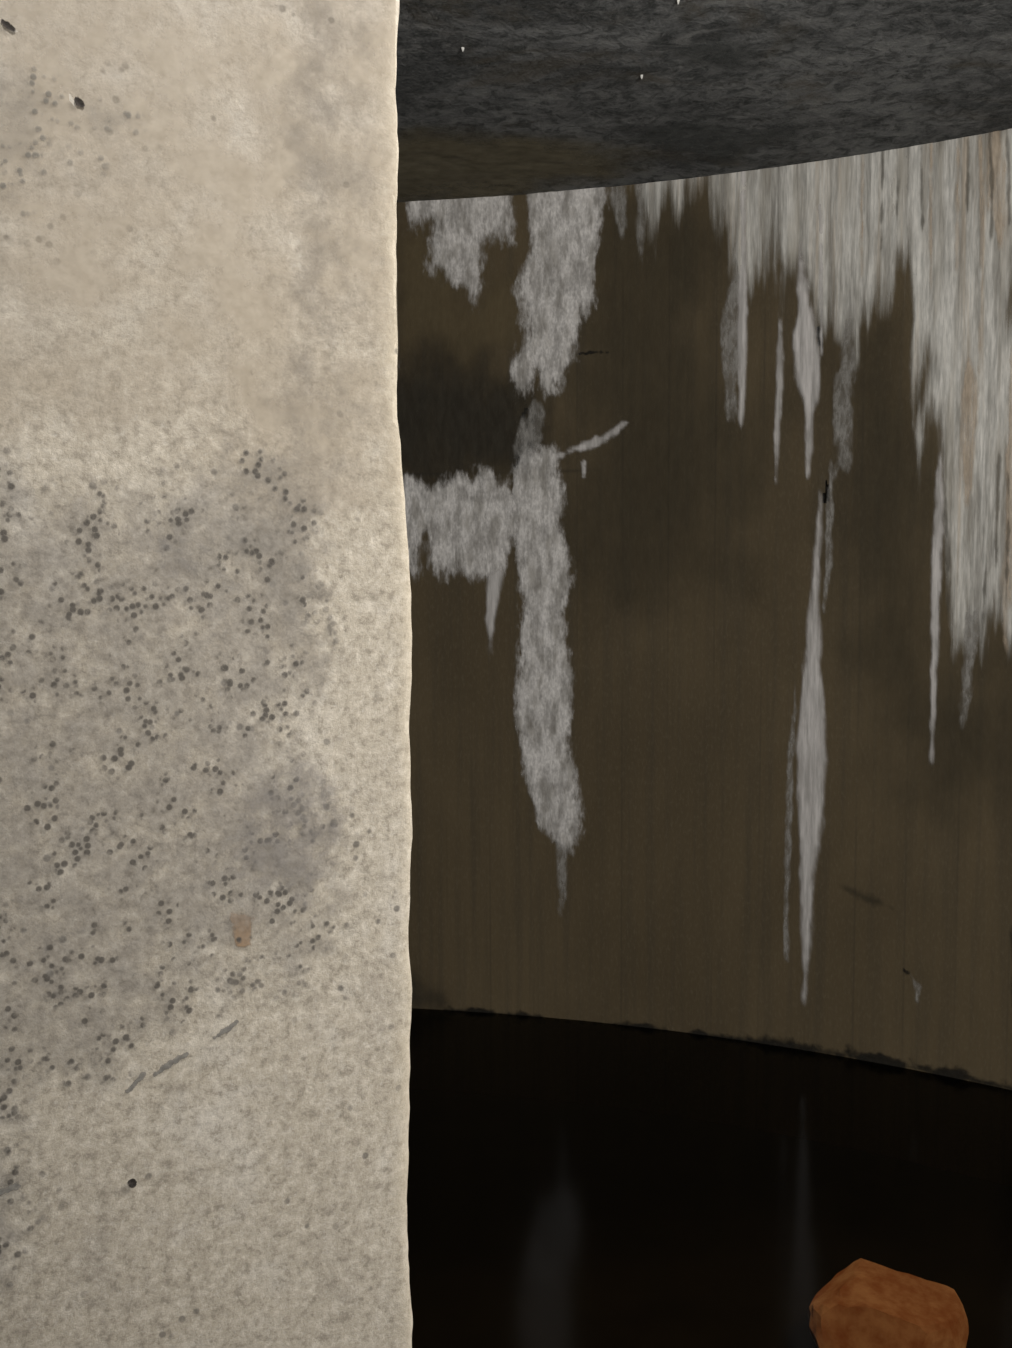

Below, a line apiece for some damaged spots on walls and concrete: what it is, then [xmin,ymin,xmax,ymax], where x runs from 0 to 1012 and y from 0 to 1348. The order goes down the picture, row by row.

water stain [397,133,627,882]
water stain [784,507,833,967]
water stain [637,128,1012,726]